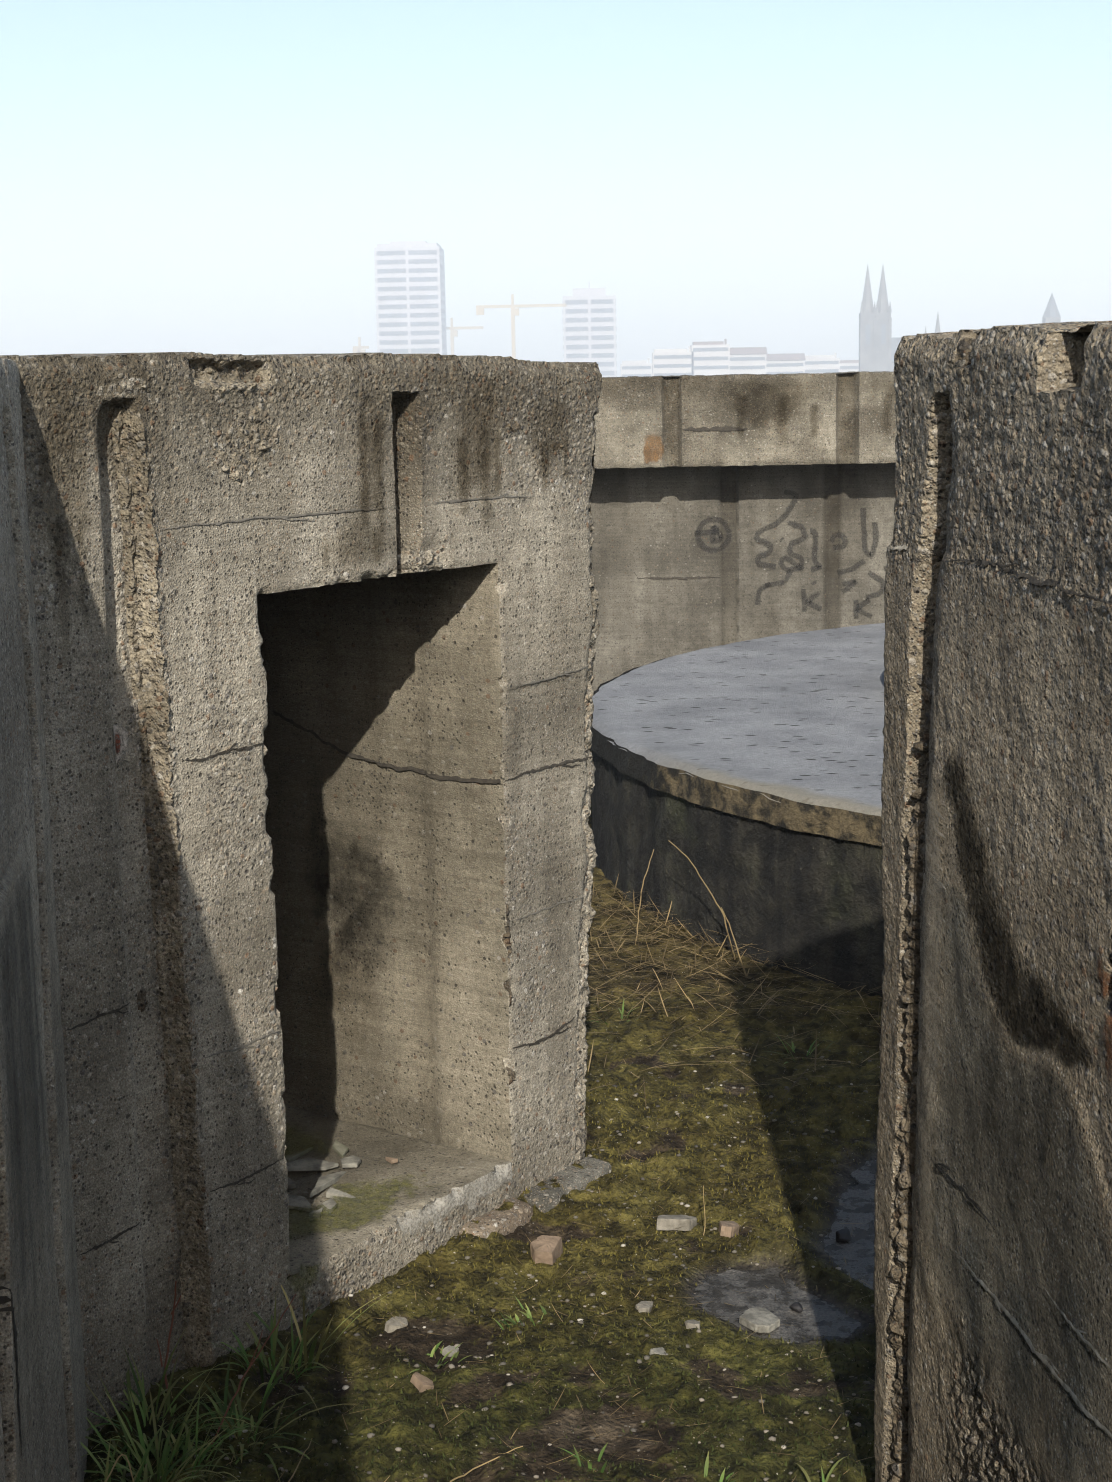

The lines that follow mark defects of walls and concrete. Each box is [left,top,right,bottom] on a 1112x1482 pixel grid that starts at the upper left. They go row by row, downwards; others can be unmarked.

crack [888,543,908,551]
crack [944,557,1112,605]
crack [182,710,593,784]
crack [513,1018,574,1048]
crack [917,1138,995,1230]
crack [955,1251,1112,1437]